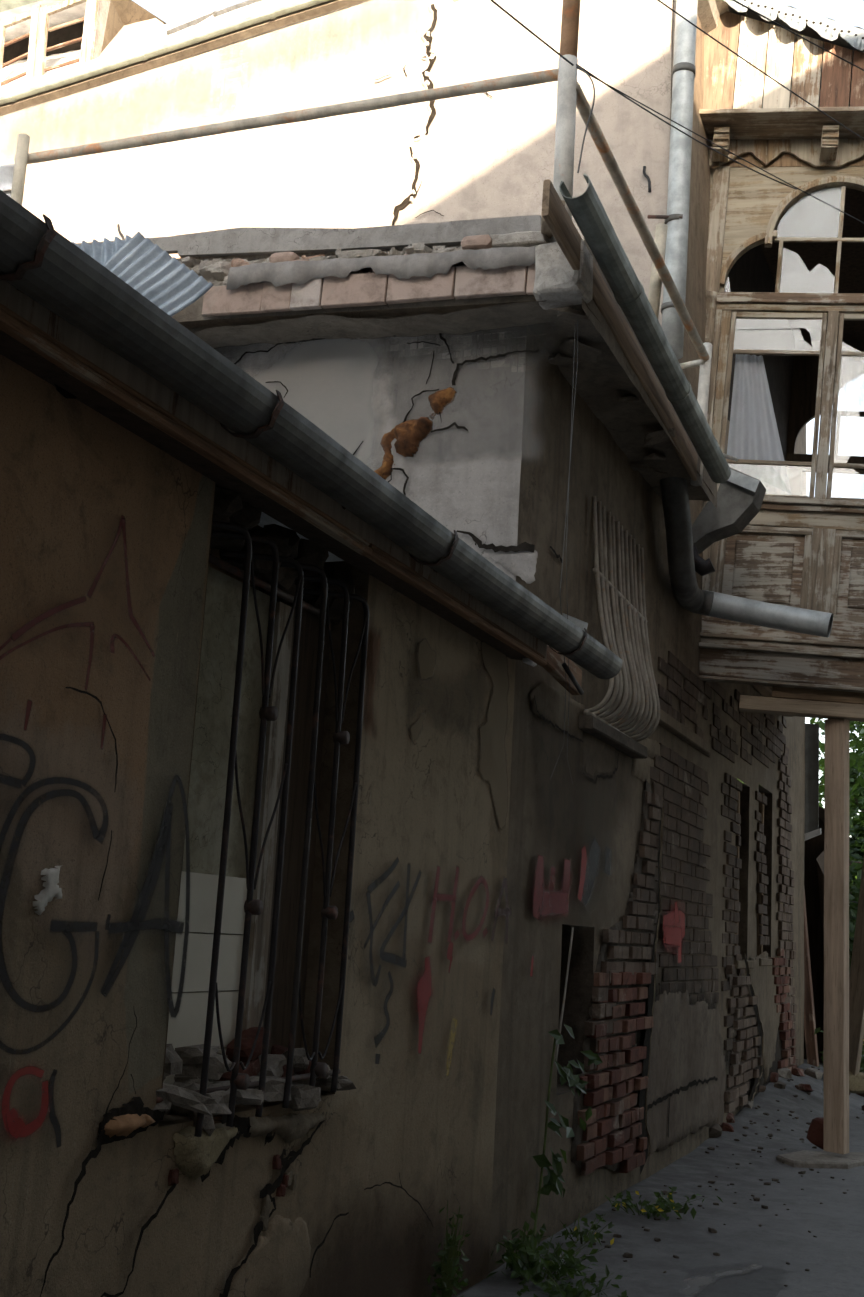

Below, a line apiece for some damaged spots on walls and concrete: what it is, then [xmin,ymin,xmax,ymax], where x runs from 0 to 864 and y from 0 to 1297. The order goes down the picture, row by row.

crack [374,0,456,226]
crack [234,338,324,397]
crack [394,333,539,433]
crack [388,468,409,496]
flaking render [571,779,663,1176]
flaking render [724,948,797,1113]
crack [40,1006,137,1297]
crack [100,1168,179,1297]
crack [219,1120,433,1297]